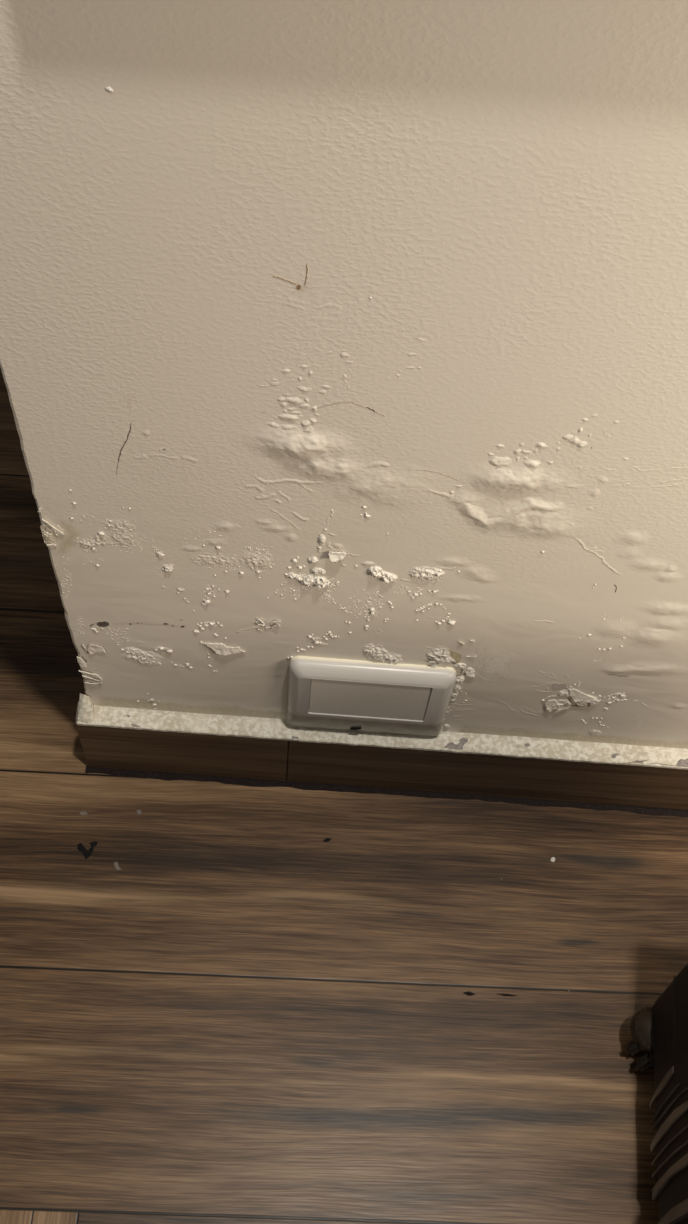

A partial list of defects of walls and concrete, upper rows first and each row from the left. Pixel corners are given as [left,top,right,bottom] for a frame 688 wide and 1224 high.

peeling [326,533,362,567]
peeling [200,617,280,672]
spalling [76,621,109,724]
peeling [531,670,647,713]